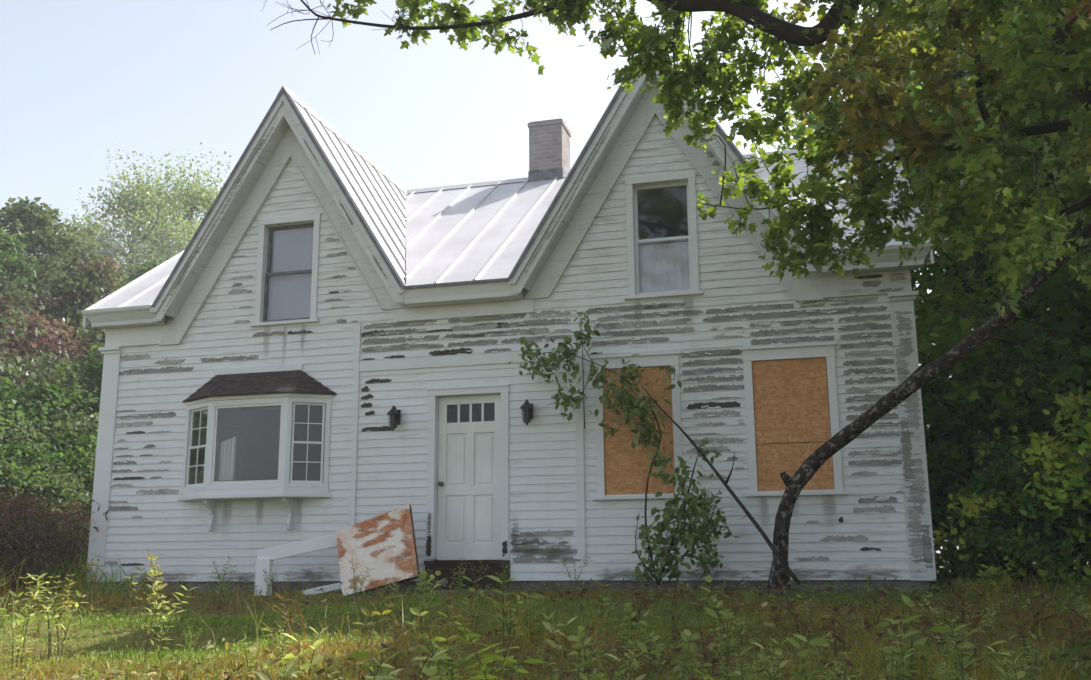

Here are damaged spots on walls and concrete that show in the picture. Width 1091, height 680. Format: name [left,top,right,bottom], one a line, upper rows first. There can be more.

peeling [324,237,573,360]
peeling [119,354,259,375]
peeling [361,378,392,432]
peeling [586,273,914,480]
peeling [109,410,179,518]
peeling [838,392,933,573]
peeling [510,529,580,563]
peeling [820,535,882,551]